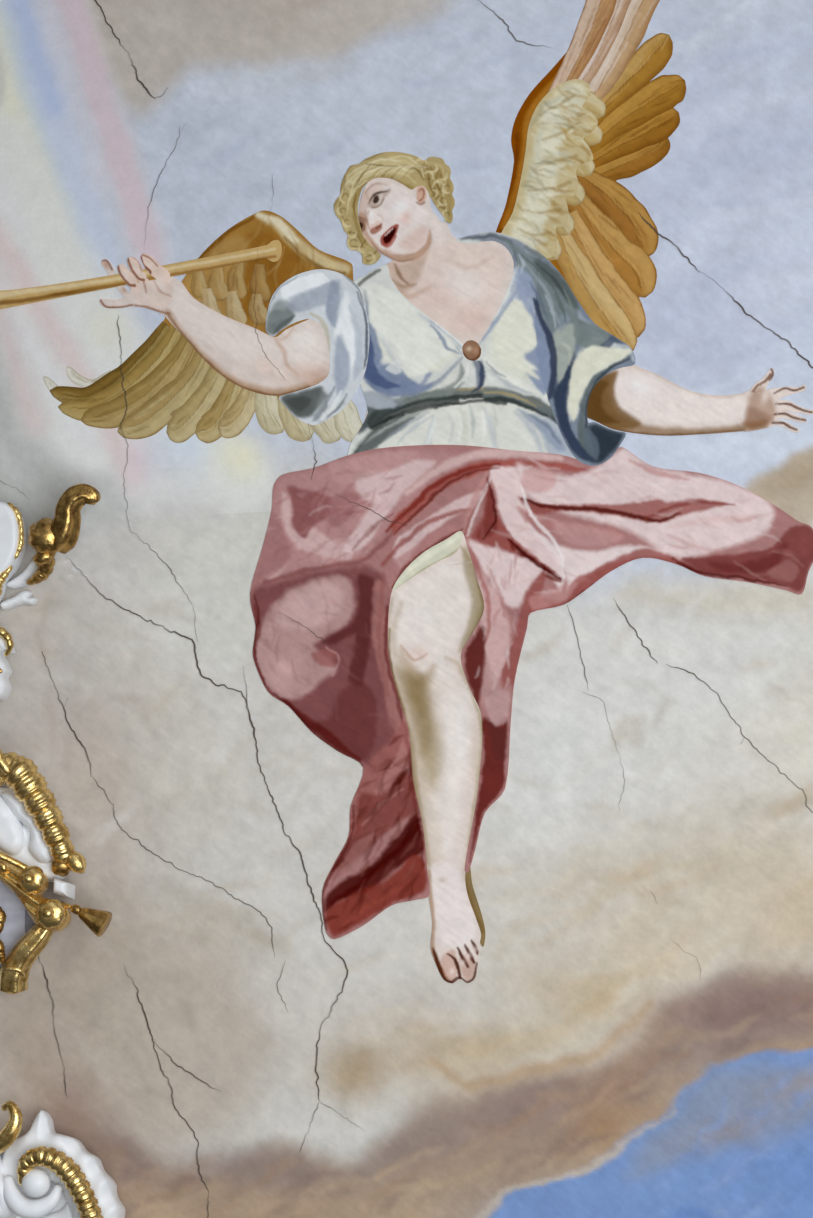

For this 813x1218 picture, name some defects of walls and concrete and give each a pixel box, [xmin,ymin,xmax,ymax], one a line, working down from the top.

crack [95,0,167,98]
crack [487,7,535,46]
crack [638,212,698,271]
crack [732,297,813,368]
crack [567,605,608,721]
crack [616,603,811,811]
crack [58,695,288,1012]
crack [93,551,348,1111]
crack [136,987,214,1217]